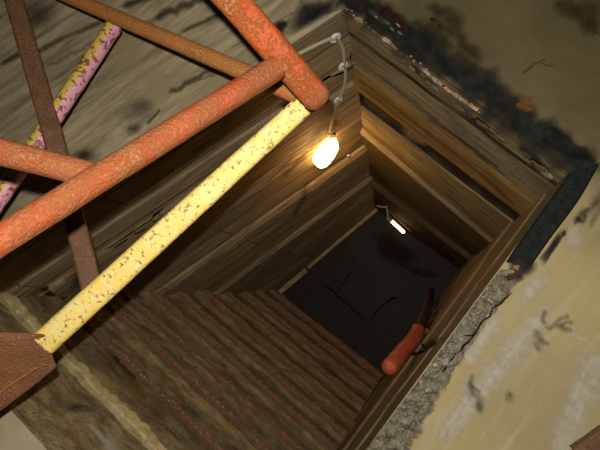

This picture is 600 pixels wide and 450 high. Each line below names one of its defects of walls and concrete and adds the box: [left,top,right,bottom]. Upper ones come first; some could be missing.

water stain [275,0,595,173]
spalling [366,270,524,450]
crack [443,293,511,372]